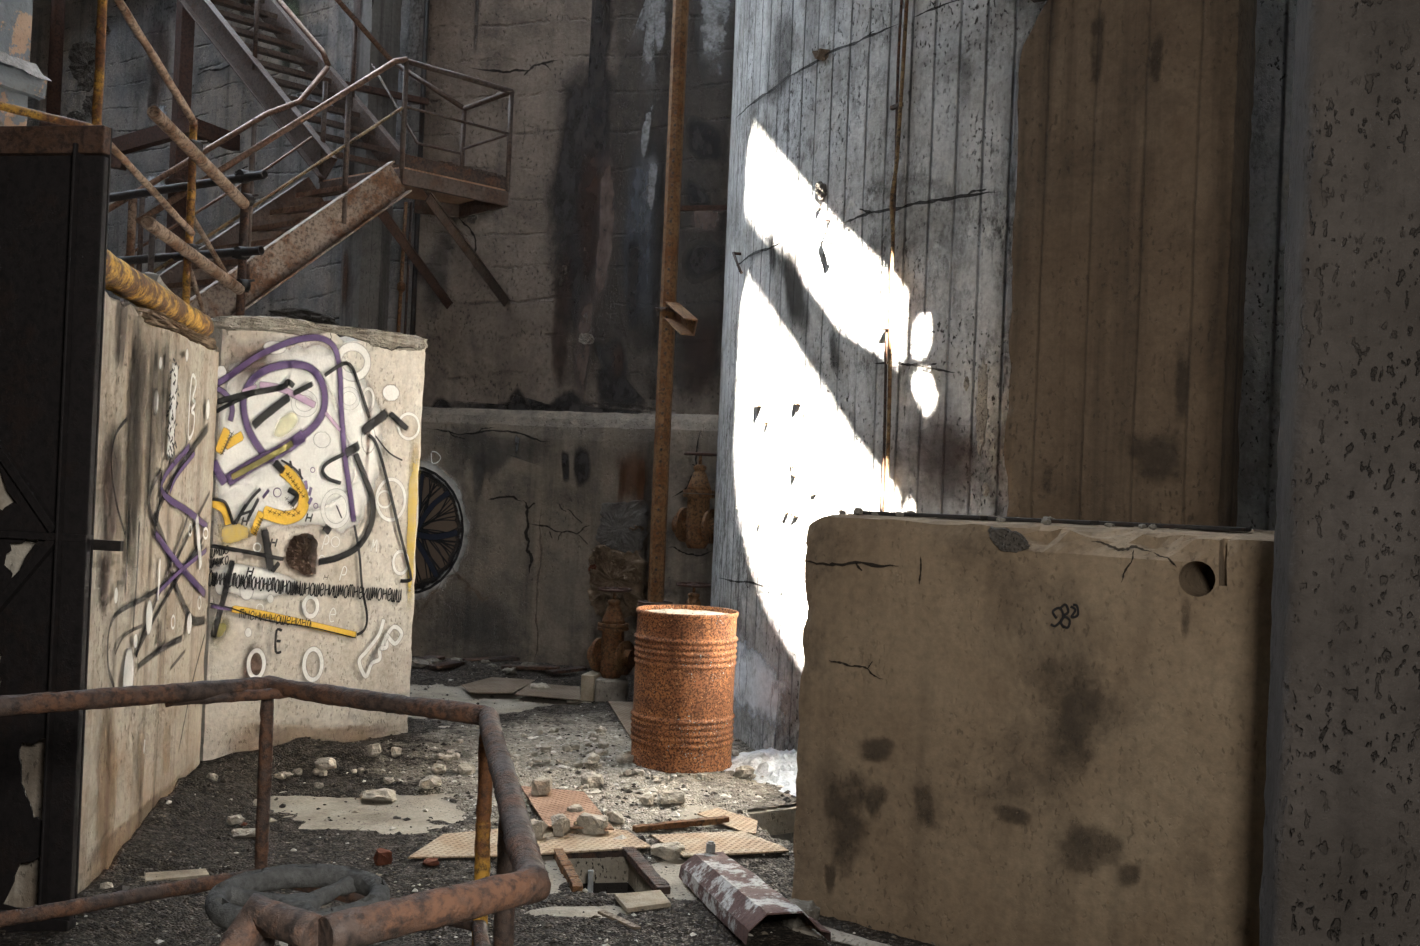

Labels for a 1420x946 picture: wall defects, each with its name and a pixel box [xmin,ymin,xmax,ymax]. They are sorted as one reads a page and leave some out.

leakage [636,0,666,84]
crack [737,0,959,117]
leakage [432,0,658,414]
crack [833,189,993,227]
crack [489,496,591,574]
spalling [988,526,1030,553]